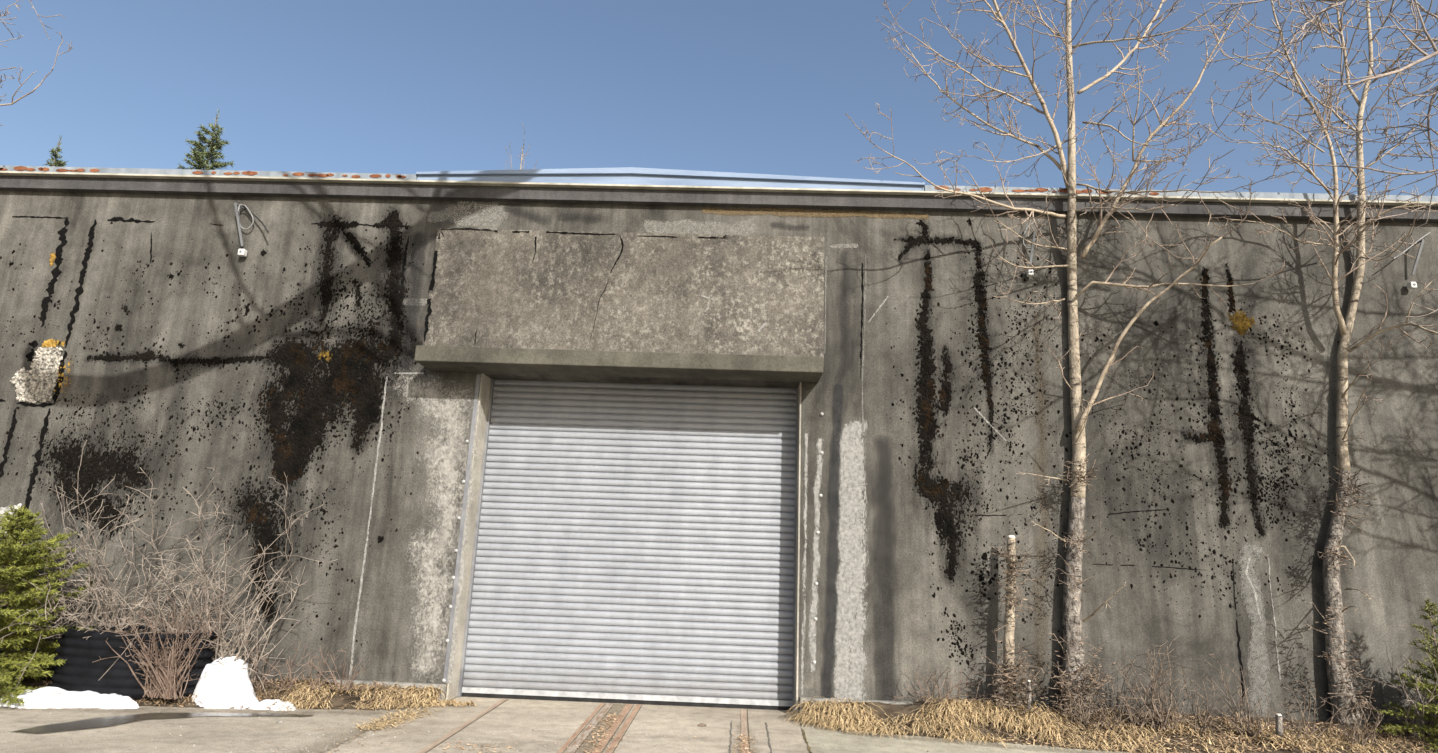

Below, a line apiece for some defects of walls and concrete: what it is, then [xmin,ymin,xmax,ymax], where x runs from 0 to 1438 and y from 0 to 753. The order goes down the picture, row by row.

crack [298,223,726,358]
spalling [10,347,63,403]
leakage [800,254,894,701]